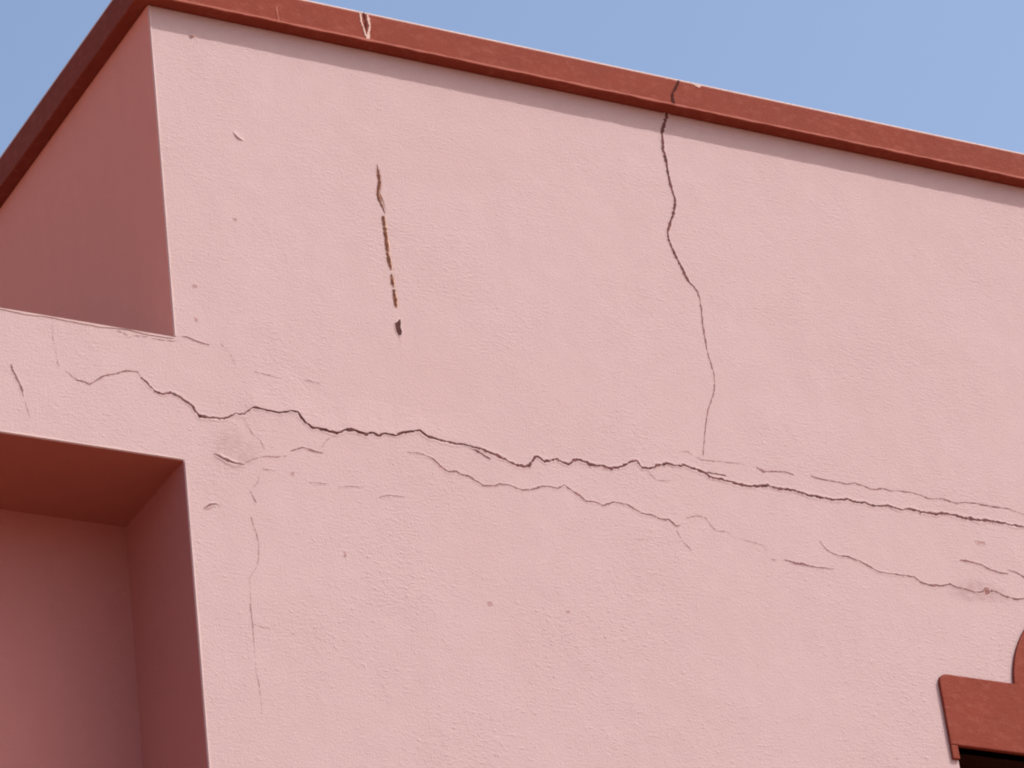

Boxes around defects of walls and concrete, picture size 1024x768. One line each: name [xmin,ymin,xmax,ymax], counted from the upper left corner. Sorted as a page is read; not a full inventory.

crack [52,80,1024,639]